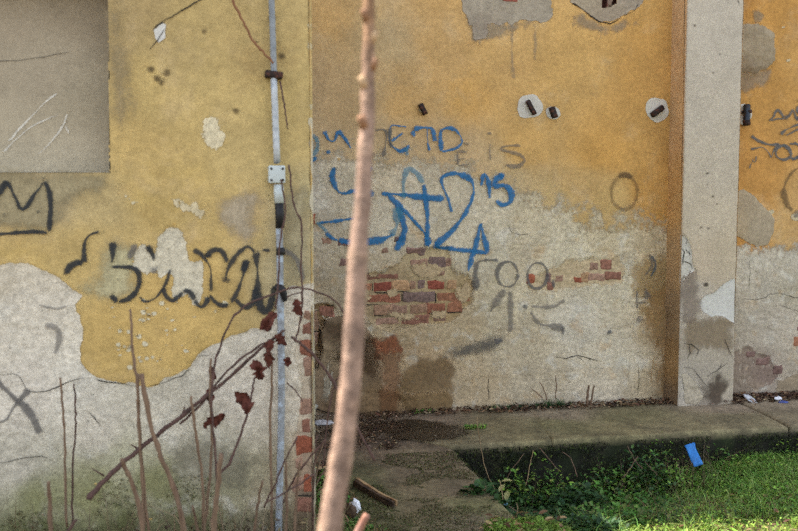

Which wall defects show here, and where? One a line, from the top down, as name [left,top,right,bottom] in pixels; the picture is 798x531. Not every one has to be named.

crack [150,0,200,49]
peeling [0,104,357,531]
leakage [362,338,379,374]
peeling [365,151,667,410]
spalling [679,234,695,282]
peeling [699,243,798,397]